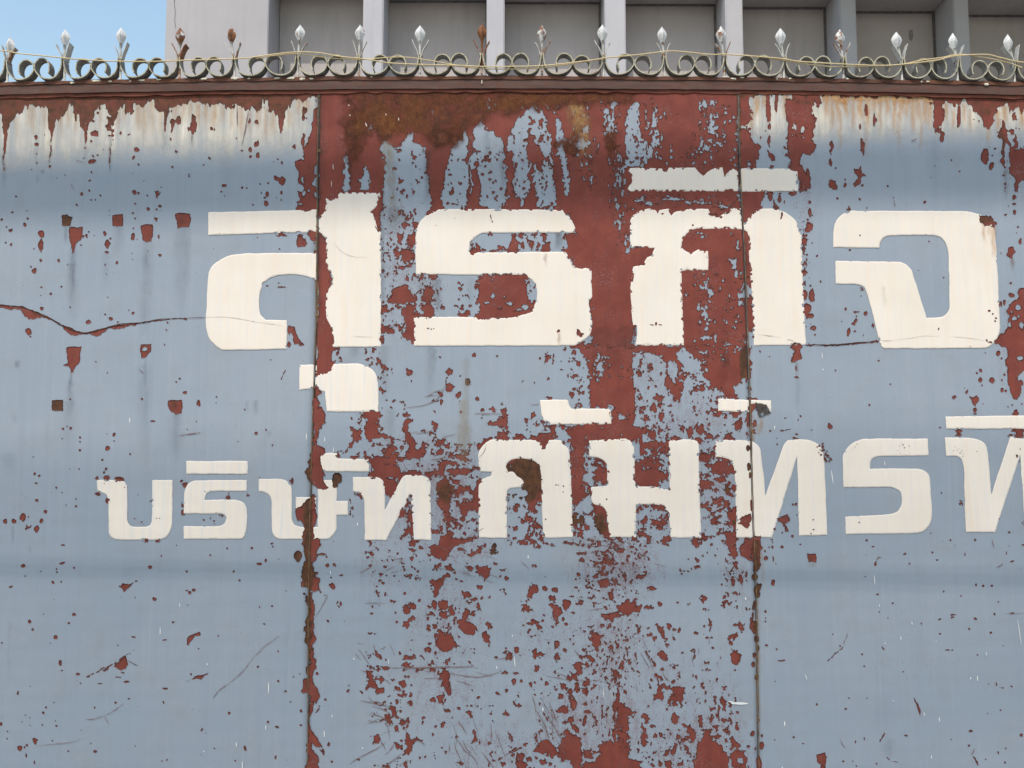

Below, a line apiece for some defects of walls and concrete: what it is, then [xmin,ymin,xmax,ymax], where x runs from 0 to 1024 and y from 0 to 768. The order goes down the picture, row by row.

rust [344,89,634,158]
peeling [926,97,1024,258]
crack [0,304,280,336]
peeling [0,76,881,768]
peeling [952,282,1024,462]